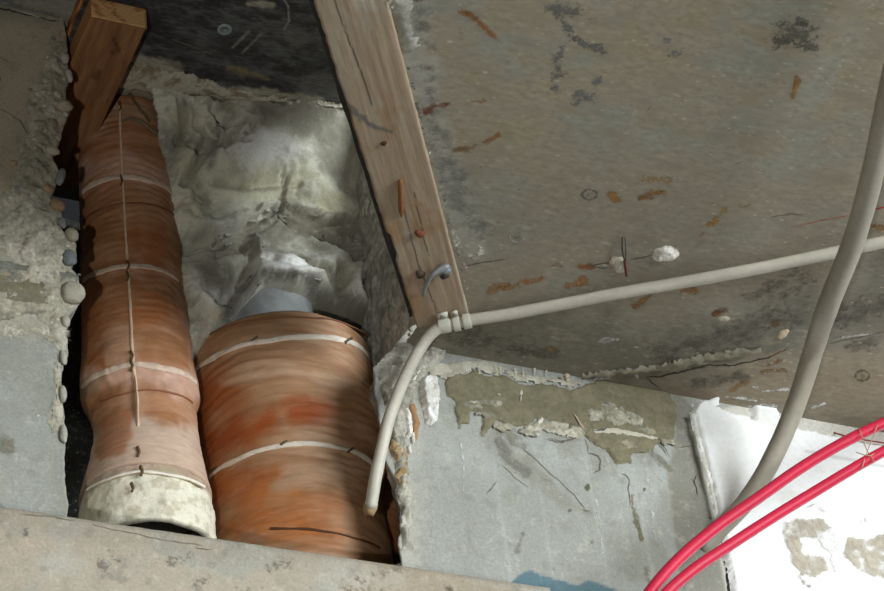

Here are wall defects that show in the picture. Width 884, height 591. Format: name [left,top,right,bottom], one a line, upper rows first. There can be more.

rust [458,11,496,38]
damp [545,4,607,54]
damp [773,17,819,51]
spalling [0,23,86,443]
crack [827,332,882,344]
crack [580,347,802,391]
peeling [464,399,502,409]
peeling [493,401,677,450]